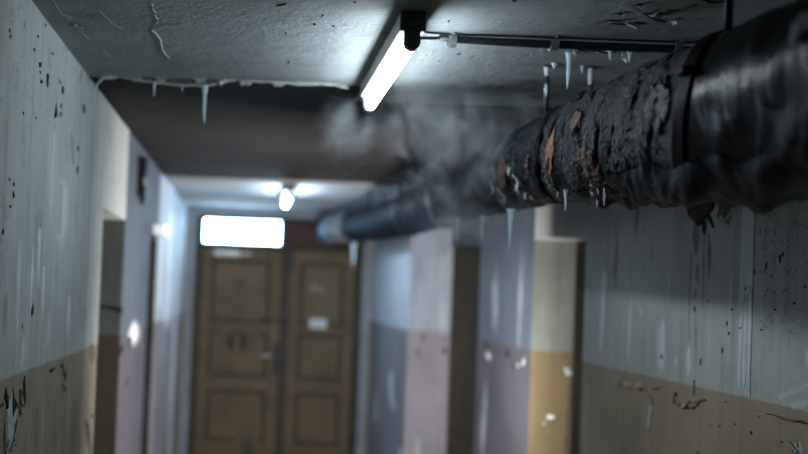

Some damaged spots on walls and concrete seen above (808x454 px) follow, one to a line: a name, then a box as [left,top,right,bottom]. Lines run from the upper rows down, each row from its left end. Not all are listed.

crack [152,5,181,58]
peeling [596,0,767,36]
peeling [673,380,707,410]
peeling [0,376,26,454]
crack [751,409,808,424]